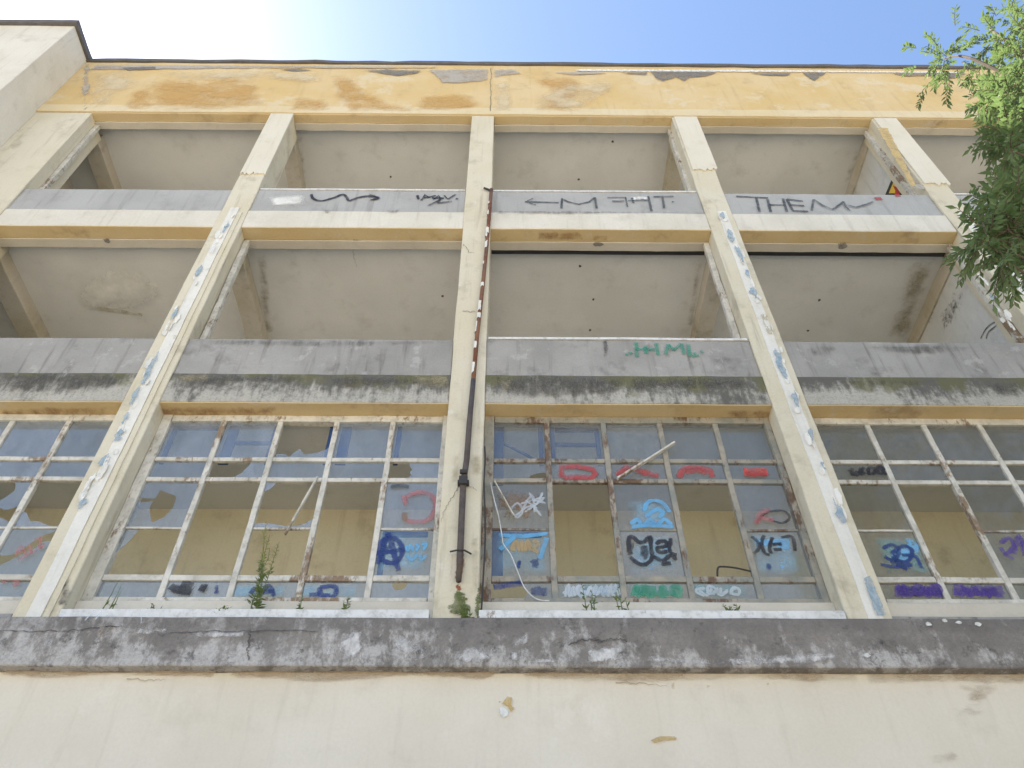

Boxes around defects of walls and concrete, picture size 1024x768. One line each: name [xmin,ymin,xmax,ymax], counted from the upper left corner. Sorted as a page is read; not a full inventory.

peeling [718,212,774,334]
peeling [774,347,800,413]
peeling [78,352,159,509]
peeling [833,488,847,523]
peeling [865,576,885,615]
crack [1,625,119,633]
crack [170,630,315,660]
leakage [237,671,406,680]
leakage [340,633,361,657]
leakage [424,649,495,678]
leakage [588,648,619,661]
leakage [774,654,833,681]